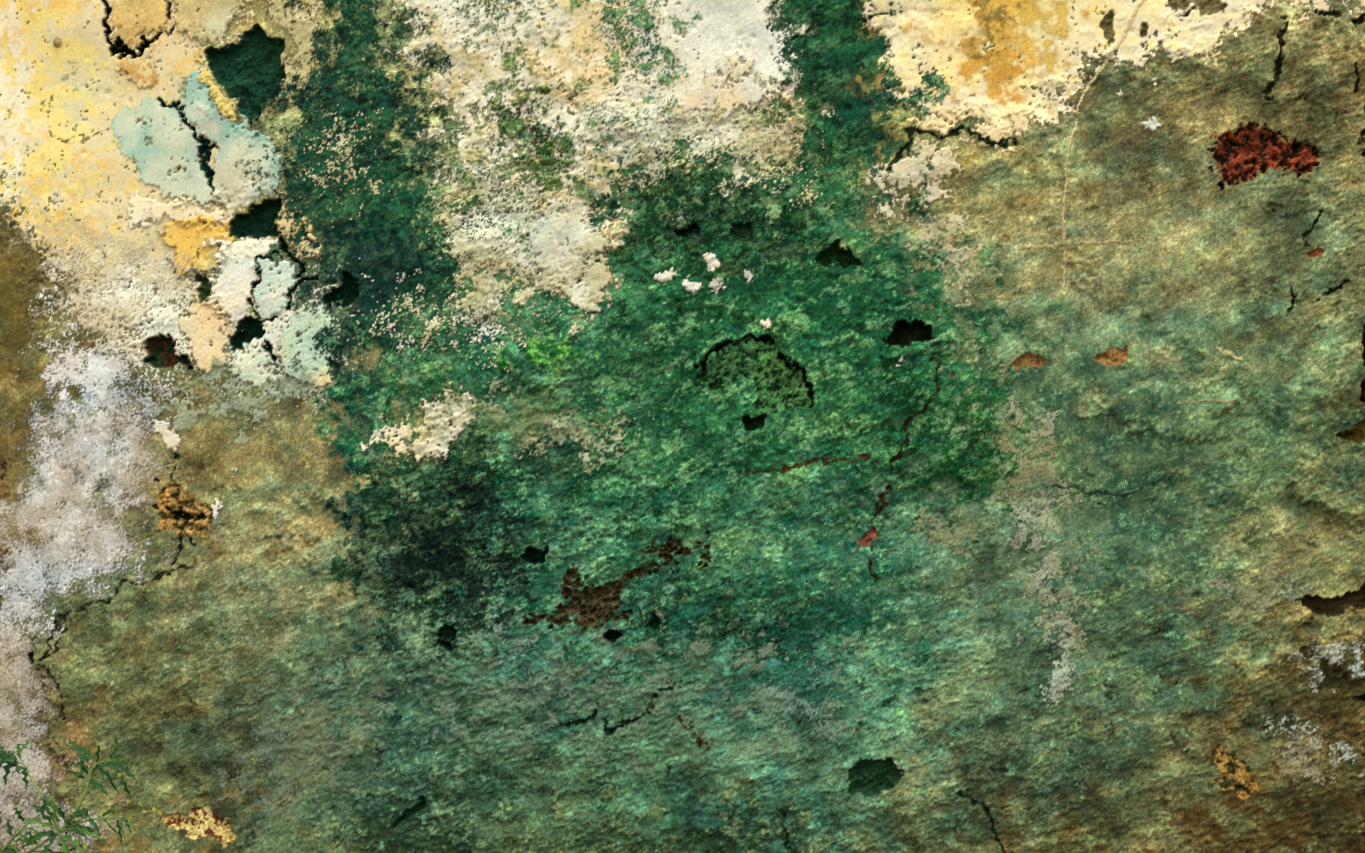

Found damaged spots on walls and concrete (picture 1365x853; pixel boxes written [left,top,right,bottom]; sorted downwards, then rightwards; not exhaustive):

crack [102,0,175,60]
peeling [860,0,1365,307]
peeling [0,0,834,483]
flaking render [1010,352,1047,371]
flaking render [1094,347,1128,367]
flaking render [1336,324,1365,444]
leakage [0,208,176,853]
flaking render [156,480,222,539]
leakage [912,399,1097,711]